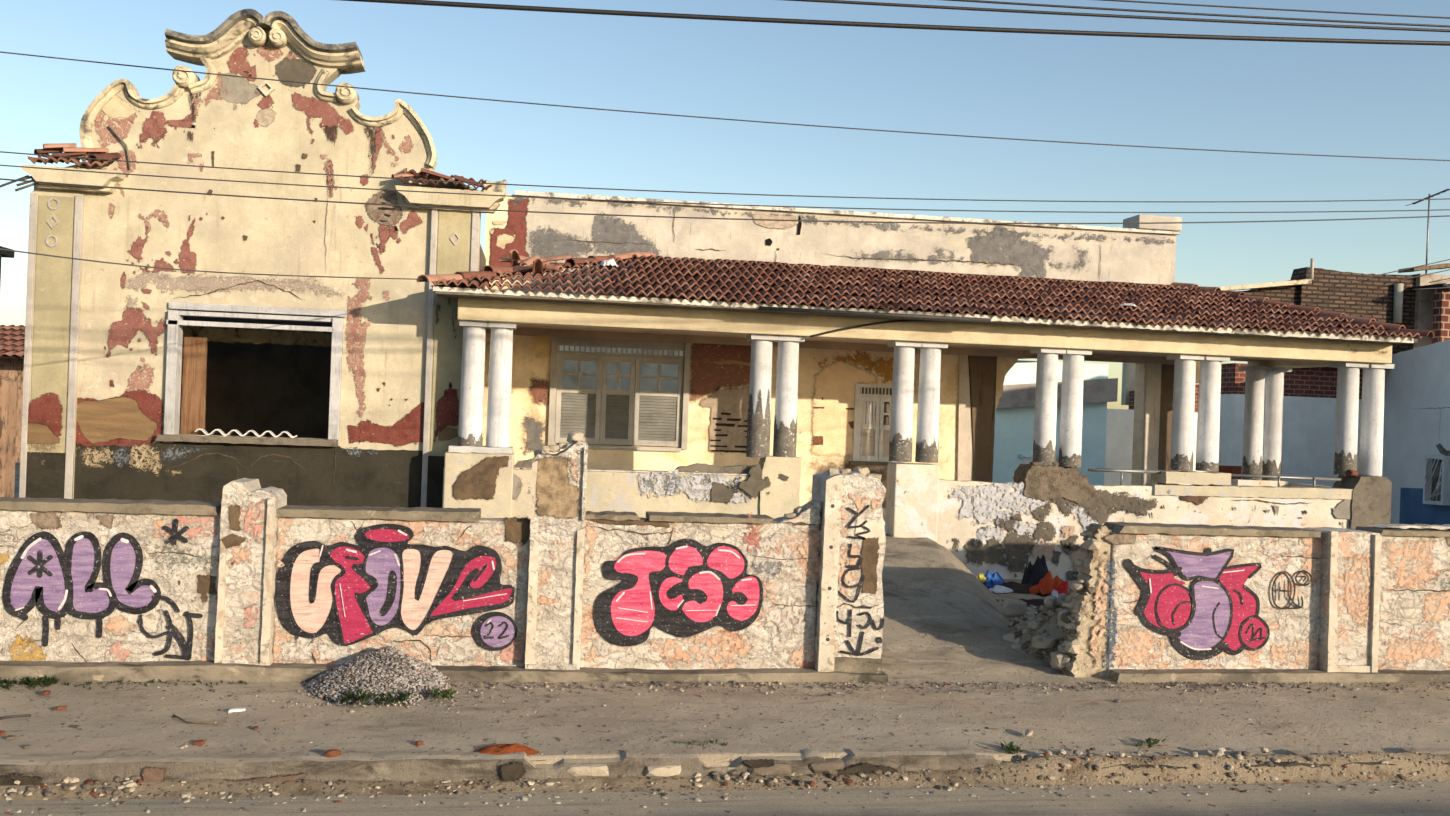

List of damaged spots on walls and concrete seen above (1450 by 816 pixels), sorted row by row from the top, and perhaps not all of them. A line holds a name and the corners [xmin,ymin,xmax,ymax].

spalling [753,214,802,250]
spalling [27,209,225,476]
spalling [94,44,671,663]
peeling [637,343,882,668]
peeling [1033,441,1082,467]
peeling [1170,452,1222,505]
peeling [1242,456,1282,481]
peeling [1333,499,1351,525]
peeling [1334,450,1358,476]
peeling [949,482,1170,669]
peeling [1246,529,1323,588]
peeling [1338,537,1450,666]